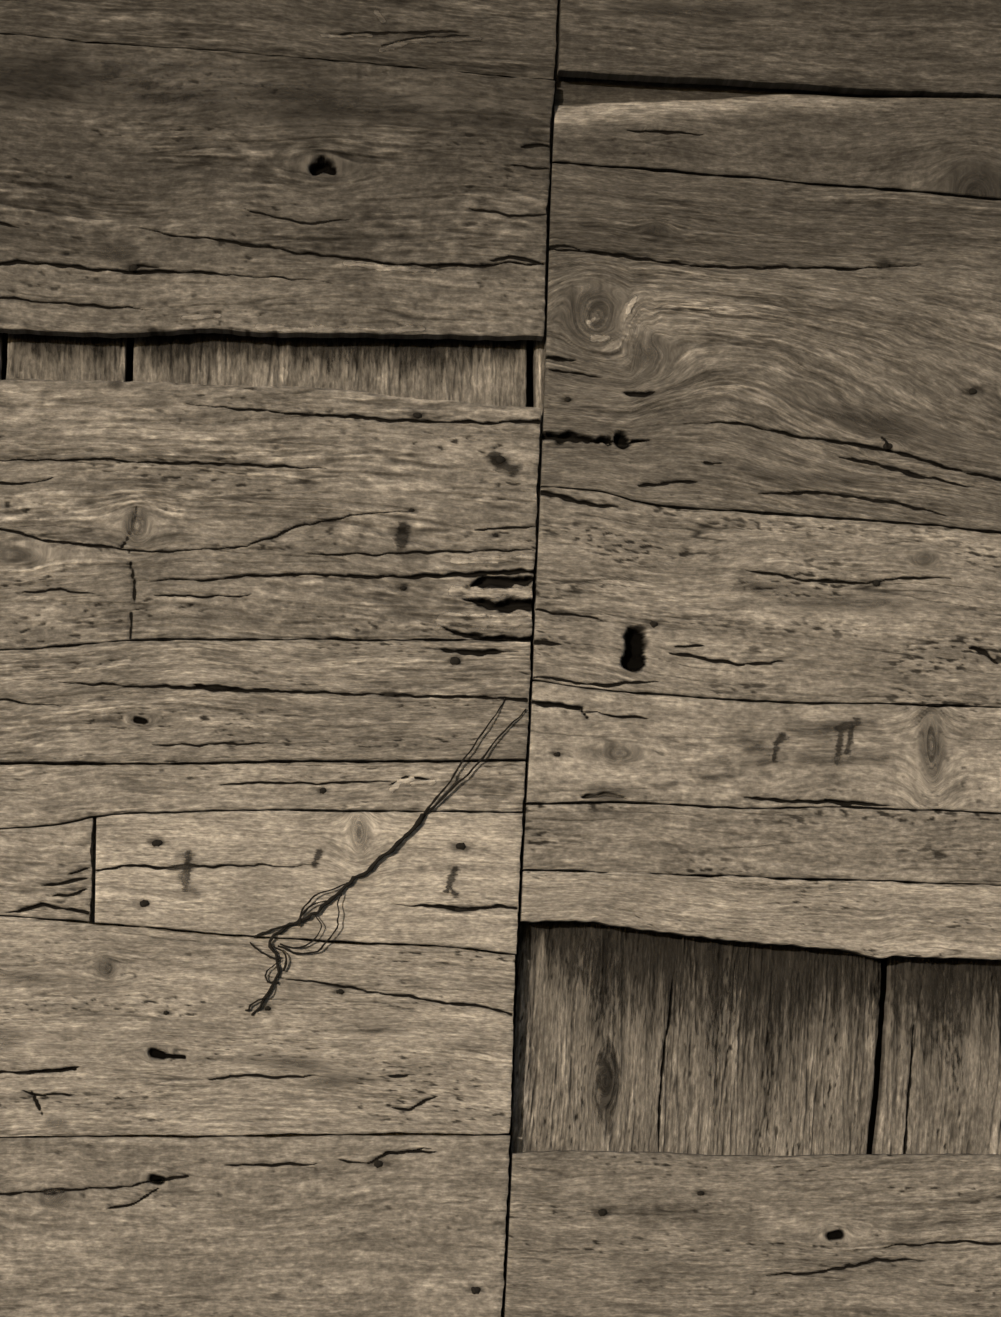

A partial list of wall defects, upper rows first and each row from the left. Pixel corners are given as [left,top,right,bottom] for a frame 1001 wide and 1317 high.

crack [509,144,549,170]
crack [0,208,921,310]
crack [0,457,326,485]
crack [540,461,721,508]
crack [0,506,783,719]
crack [0,1066,79,1115]
crack [208,1073,317,1081]
crack [388,1074,437,1111]
crack [226,1147,436,1167]
crack [0,1175,189,1209]